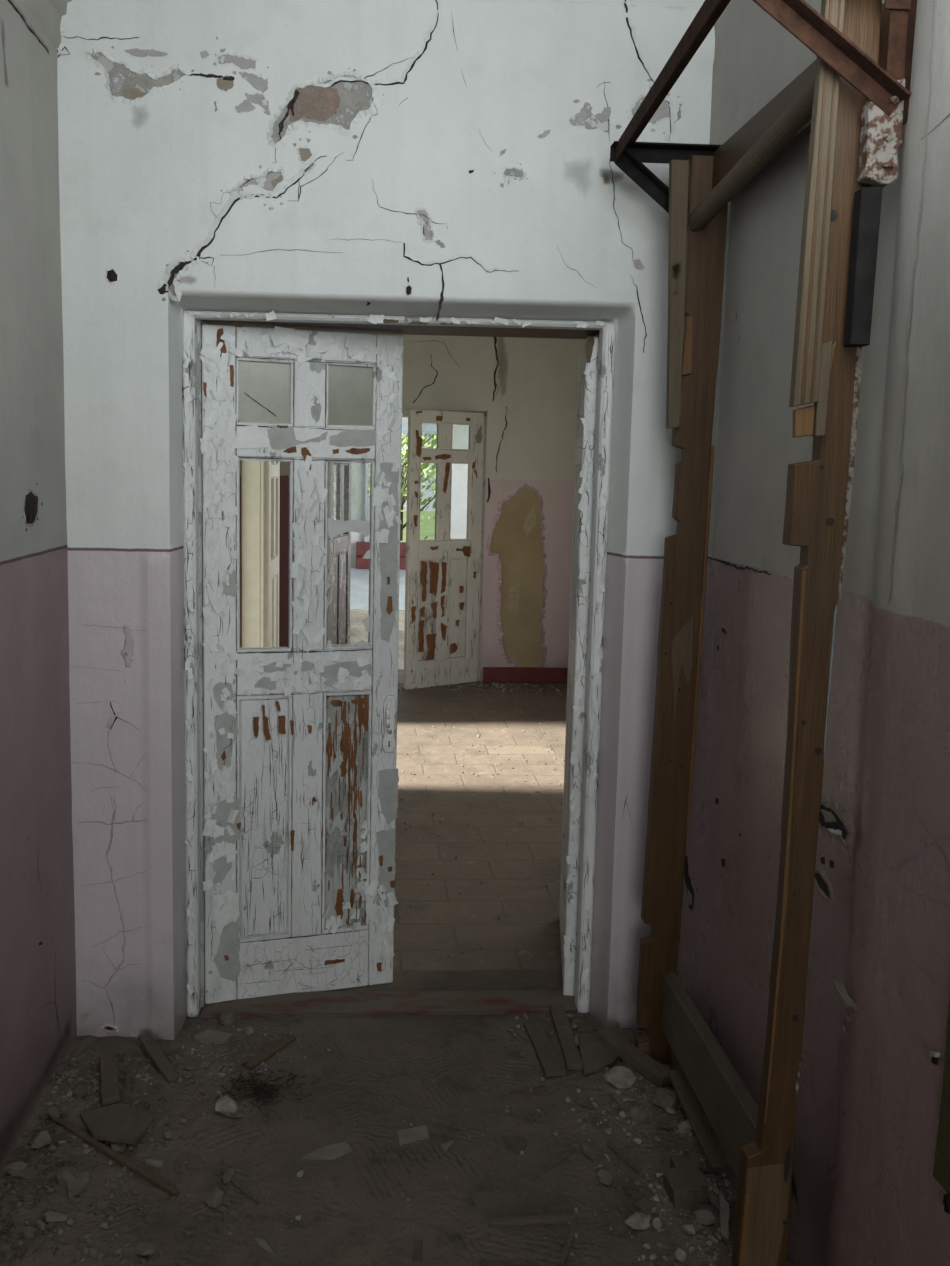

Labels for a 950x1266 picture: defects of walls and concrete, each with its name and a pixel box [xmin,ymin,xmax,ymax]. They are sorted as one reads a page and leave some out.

flaking render [84,37,384,176]
flaking render [220,165,288,210]
crack [155,0,442,292]
crack [621,0,680,141]
peeling [419,317,532,327]
peeling [416,430,451,494]
crack [182,191,519,1007]
peeling [411,546,476,660]
flaking render [486,483,548,668]
peeling [563,321,610,989]
crack [45,667,147,1068]
flaking render [818,788,855,850]